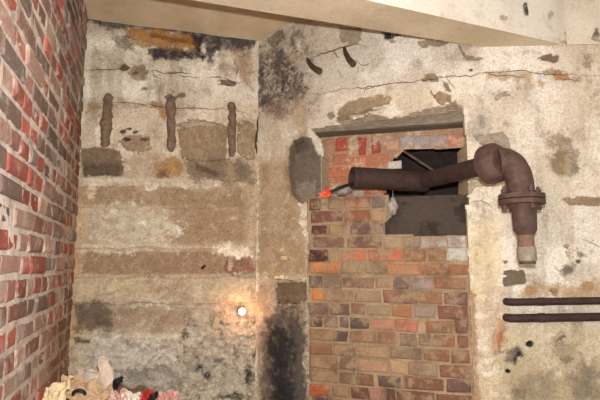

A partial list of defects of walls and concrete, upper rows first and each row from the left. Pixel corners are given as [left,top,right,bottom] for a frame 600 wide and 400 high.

rust [124,27,197,51]
leakage [87,19,256,63]
rust [88,93,114,147]
spalling [80,128,153,177]
rust [150,97,183,178]
crack [152,62,240,86]
spalling [176,119,228,161]
rust [227,102,237,157]
leakage [258,48,312,139]
spalling [327,95,391,121]
crack [264,44,600,105]
leakage [72,198,308,400]